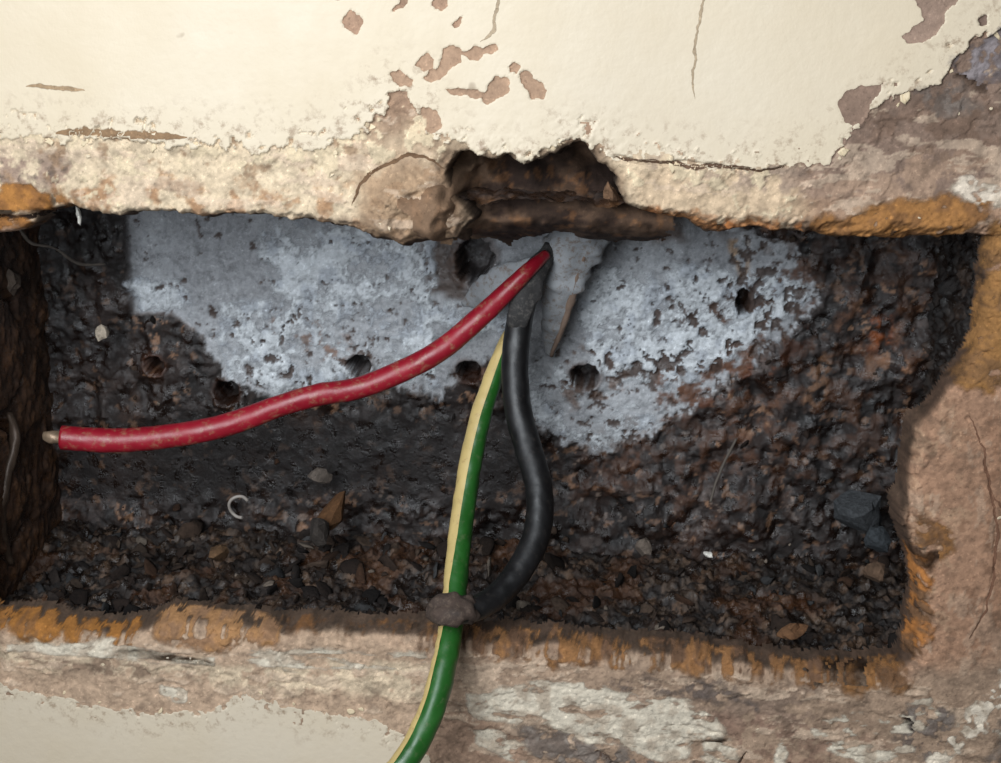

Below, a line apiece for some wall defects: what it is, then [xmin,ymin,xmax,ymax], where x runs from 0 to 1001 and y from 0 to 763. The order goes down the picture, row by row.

peeling [342,10,363,35]
crack [691,0,705,97]
peeling [902,0,958,44]
flaking render [0,28,1001,246]
crack [614,156,784,172]
rust [0,183,77,229]
peeling [426,201,1001,763]
crack [969,415,1001,637]
rust [0,599,141,646]
peeling [0,596,438,736]
rust [152,603,316,653]
rust [462,624,912,695]